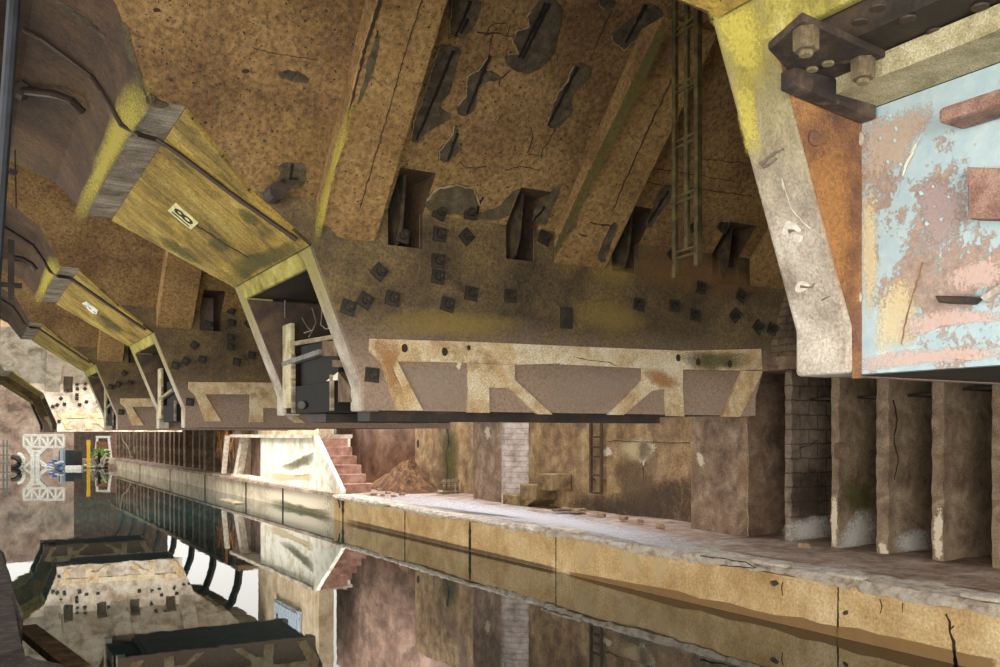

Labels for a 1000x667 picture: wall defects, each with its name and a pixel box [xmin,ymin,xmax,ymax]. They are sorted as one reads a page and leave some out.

crack [344,0,382,135]
crack [360,0,423,208]
spalling [410,0,501,163]
spalling [505,0,562,74]
peeling [862,105,932,179]
corrosion [811,148,848,277]
peeling [862,195,1000,370]
corrosion [650,372,674,386]
water stain [575,461,691,521]
water stain [787,470,877,548]
water stain [896,530,931,552]
crack [945,614,958,665]